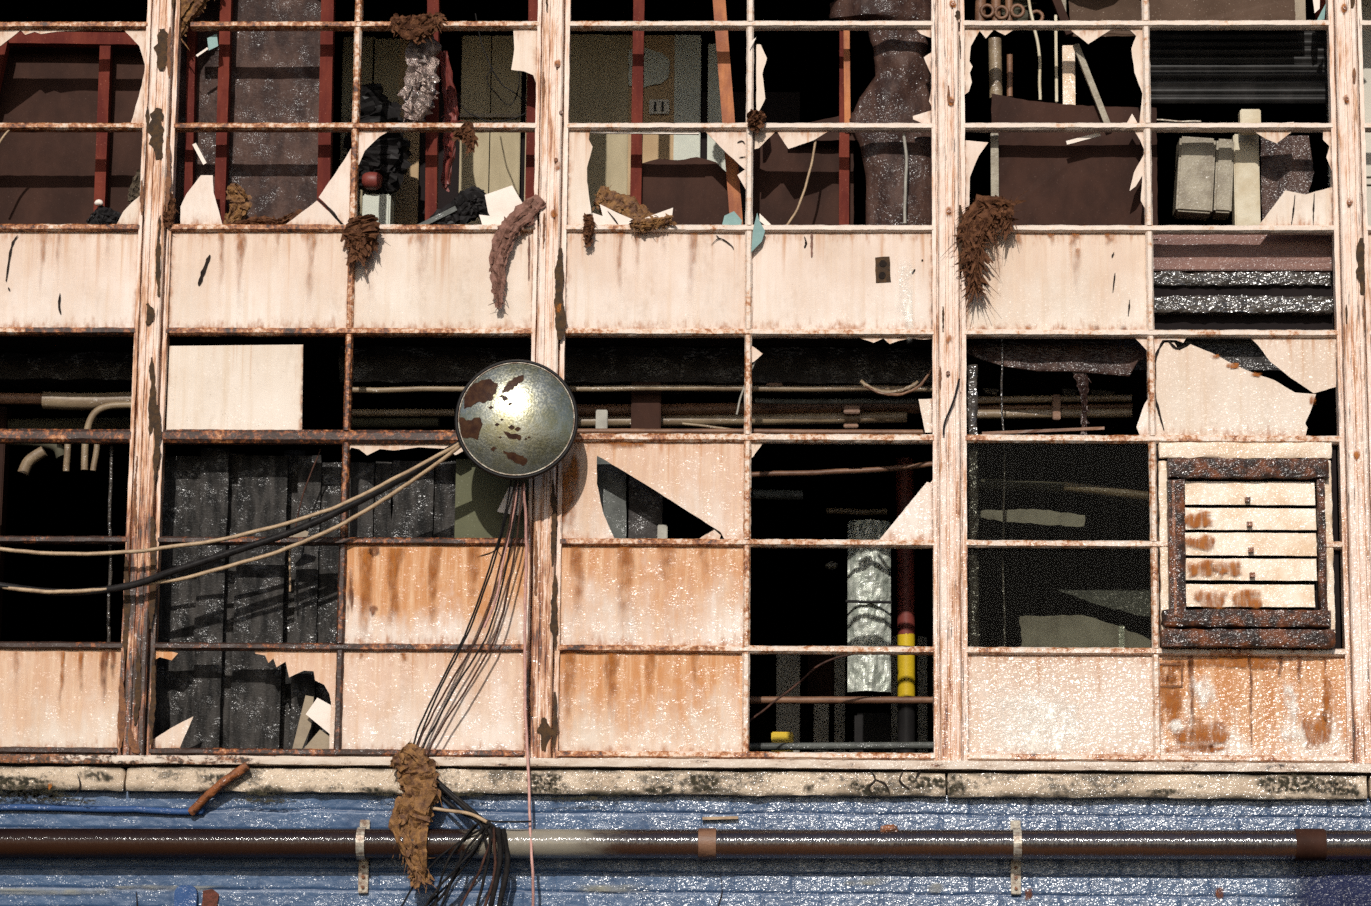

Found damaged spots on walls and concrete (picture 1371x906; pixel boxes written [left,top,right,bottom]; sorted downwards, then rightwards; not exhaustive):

rust [349,546,403,615]
rust [429,547,440,596]
rust [620,546,629,564]
rust [60,651,83,683]
rust [100,651,115,683]
rust [605,652,616,689]
rust [1160,655,1302,752]
rust [1302,659,1332,745]